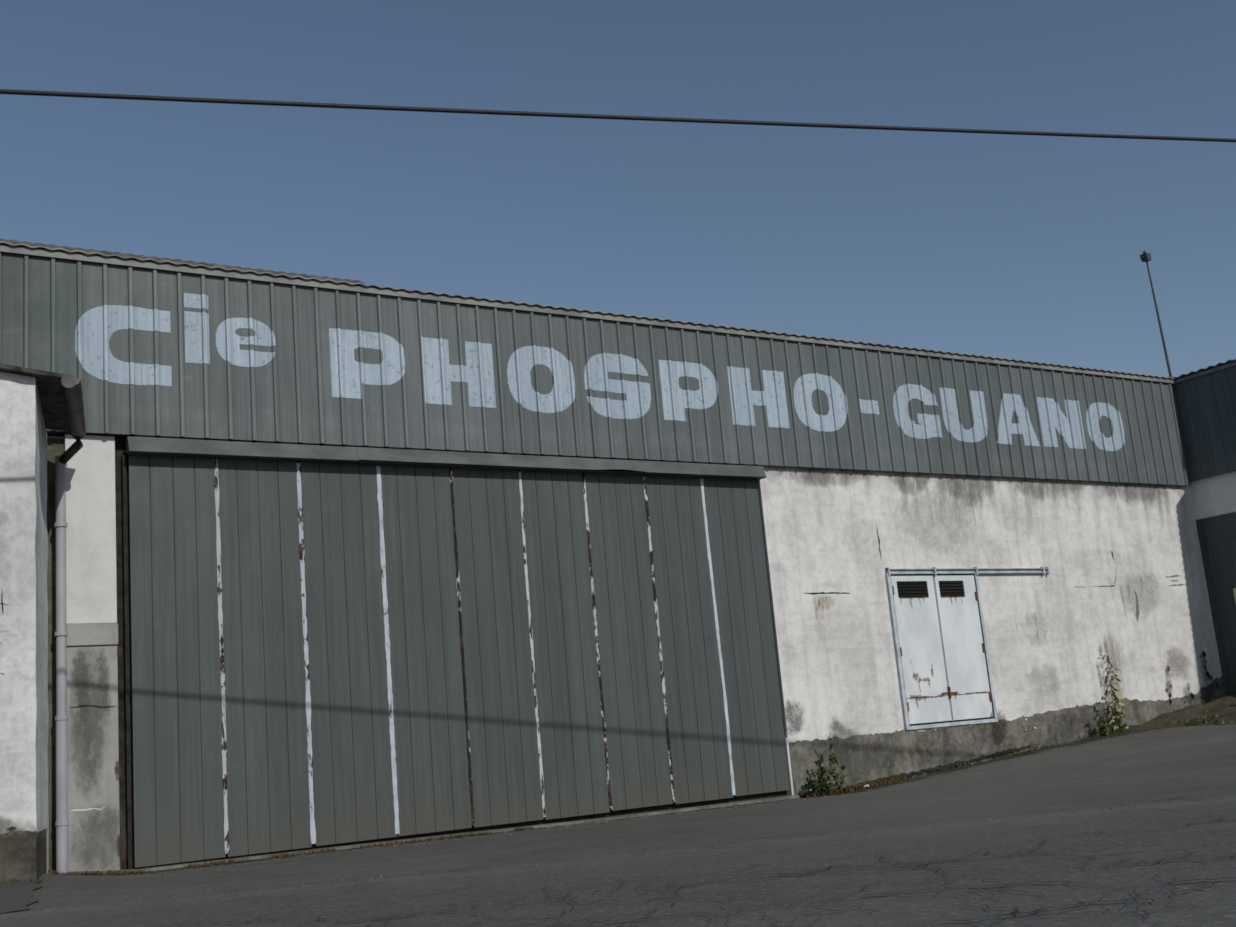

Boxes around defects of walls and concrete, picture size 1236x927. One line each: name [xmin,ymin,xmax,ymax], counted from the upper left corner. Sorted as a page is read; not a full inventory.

damp [74,658,105,776]
rust [908,667,987,705]